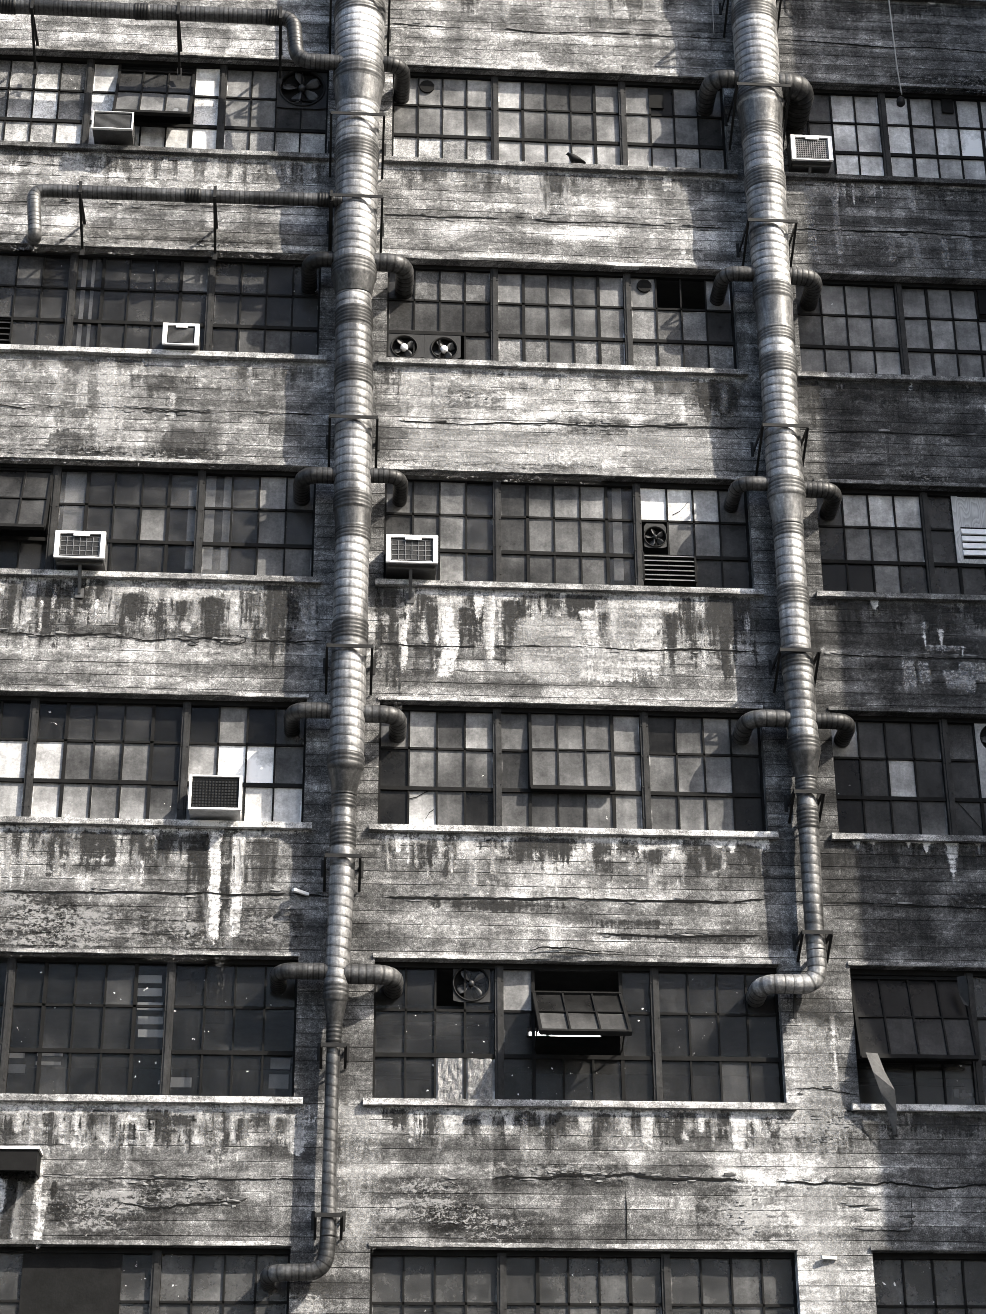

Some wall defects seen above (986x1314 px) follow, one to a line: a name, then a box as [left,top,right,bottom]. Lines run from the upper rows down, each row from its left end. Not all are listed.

damp [0,576,323,668]
damp [374,587,759,710]
damp [378,831,770,913]
damp [0,824,308,1014]
damp [592,919,772,942]
damp [383,1106,783,1156]
damp [0,1102,317,1247]
crack [492,1165,743,1243]
crack [774,1176,986,1243]